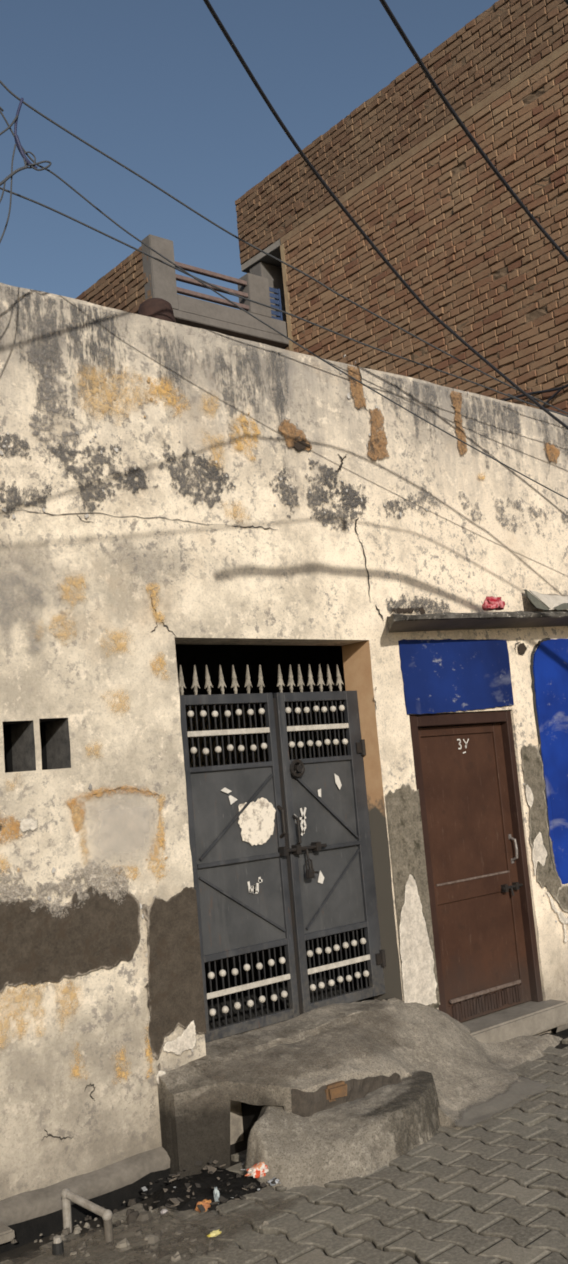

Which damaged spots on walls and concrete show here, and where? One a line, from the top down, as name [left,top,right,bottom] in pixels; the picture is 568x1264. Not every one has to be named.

water stain [0,287,288,519]
flaking render [271,419,312,460]
flaking render [340,355,389,462]
flaking render [450,390,469,455]
crack [0,509,278,530]
water stain [269,460,438,531]
crack [355,518,384,621]
peeling [385,777,440,1009]
peeling [521,743,568,943]
peeling [0,859,207,1084]